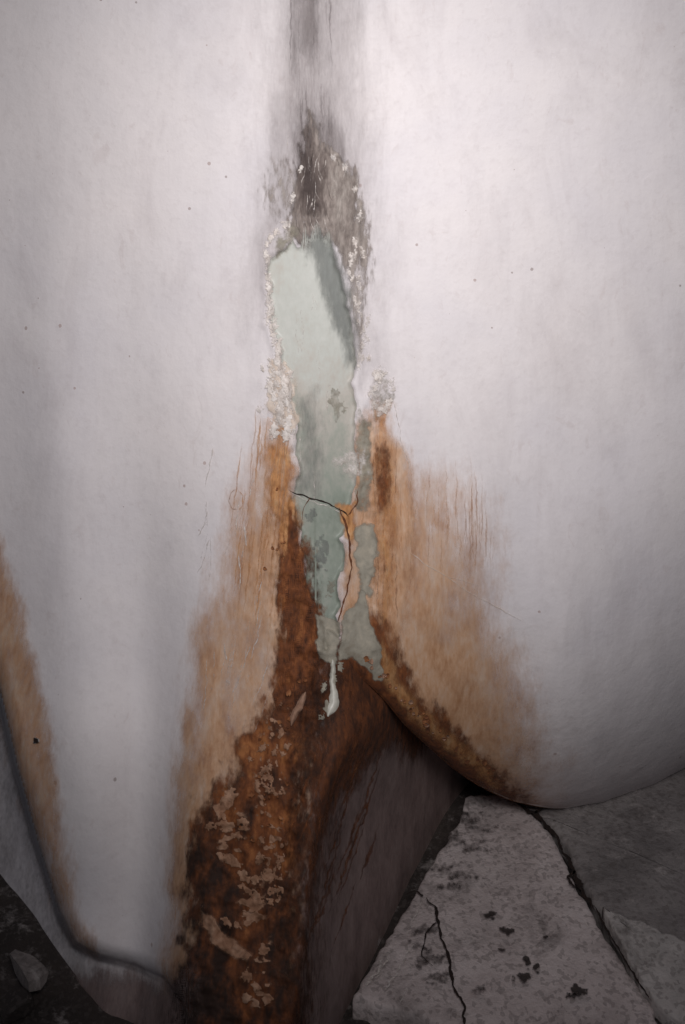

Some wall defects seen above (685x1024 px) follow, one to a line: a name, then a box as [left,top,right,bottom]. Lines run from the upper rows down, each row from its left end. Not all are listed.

peeling [256,109,399,621]
corrosion [0,563,69,903]
crack [291,491,358,622]
corrosion [165,413,538,1024]
crack [406,890,466,1024]
crack [517,802,650,999]